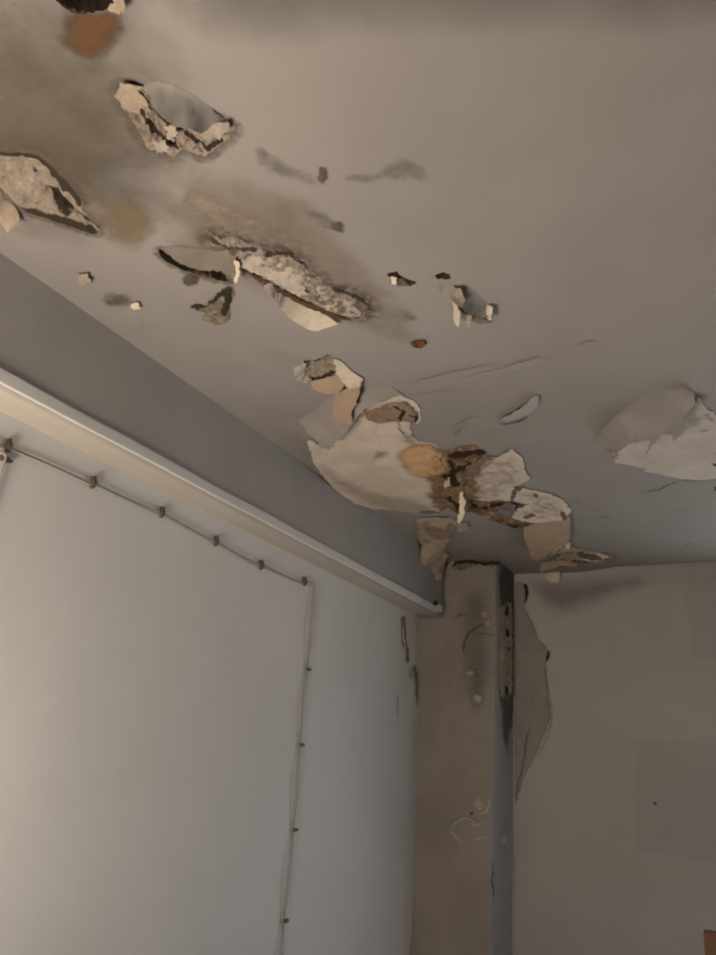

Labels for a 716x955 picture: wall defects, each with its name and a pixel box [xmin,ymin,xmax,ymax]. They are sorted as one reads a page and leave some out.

spalling [43,0,126,16]
spalling [112,80,237,160]
spalling [0,150,104,235]
spalling [156,230,373,331]
spalling [387,271,417,287]
peeling [432,272,494,328]
peeling [294,355,614,583]
peeling [594,387,716,480]
spalling [498,582,551,804]